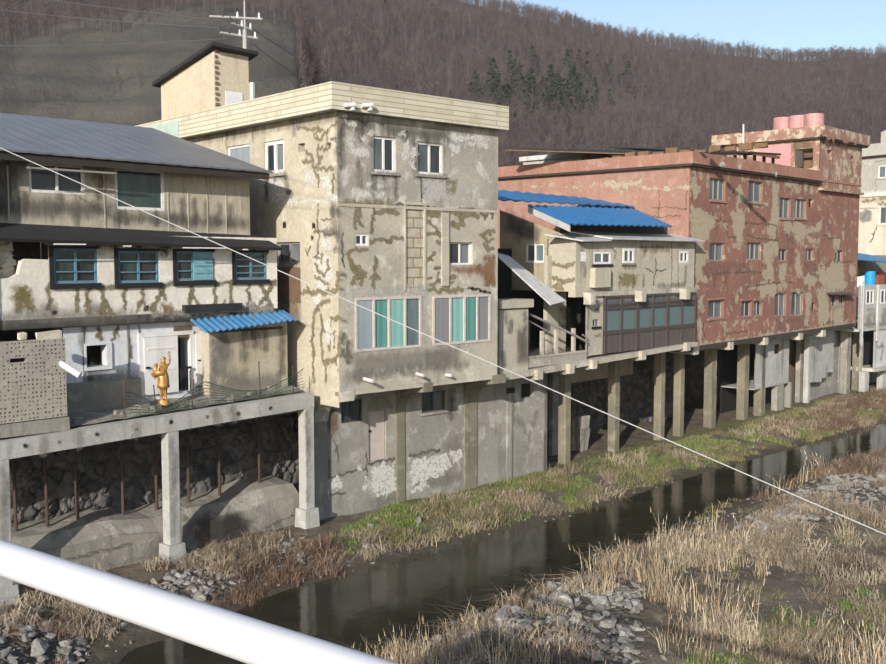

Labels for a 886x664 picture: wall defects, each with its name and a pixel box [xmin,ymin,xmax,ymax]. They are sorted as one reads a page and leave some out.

peeling [340,114,374,145]
peeling [448,139,489,157]
damp [0,161,245,226]
crack [821,159,886,266]
crack [75,121,496,384]
peeling [530,164,857,346]
crack [44,283,53,312]
damp [3,286,131,323]
damp [152,302,299,319]